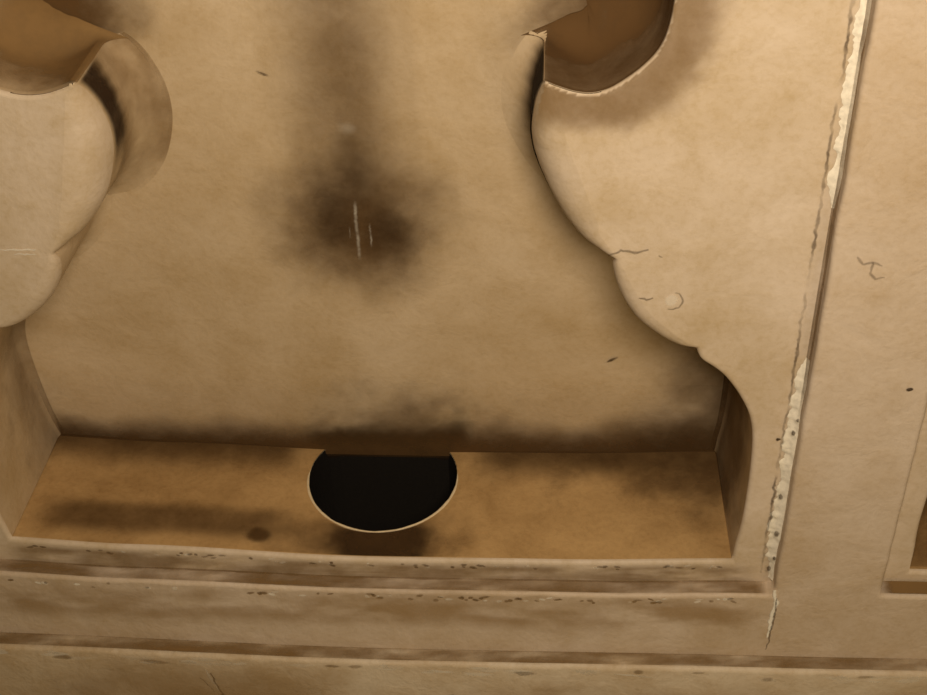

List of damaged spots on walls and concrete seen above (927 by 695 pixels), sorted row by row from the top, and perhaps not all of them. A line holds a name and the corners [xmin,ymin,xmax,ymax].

crack [827,0,872,209]
crack [765,358,810,638]